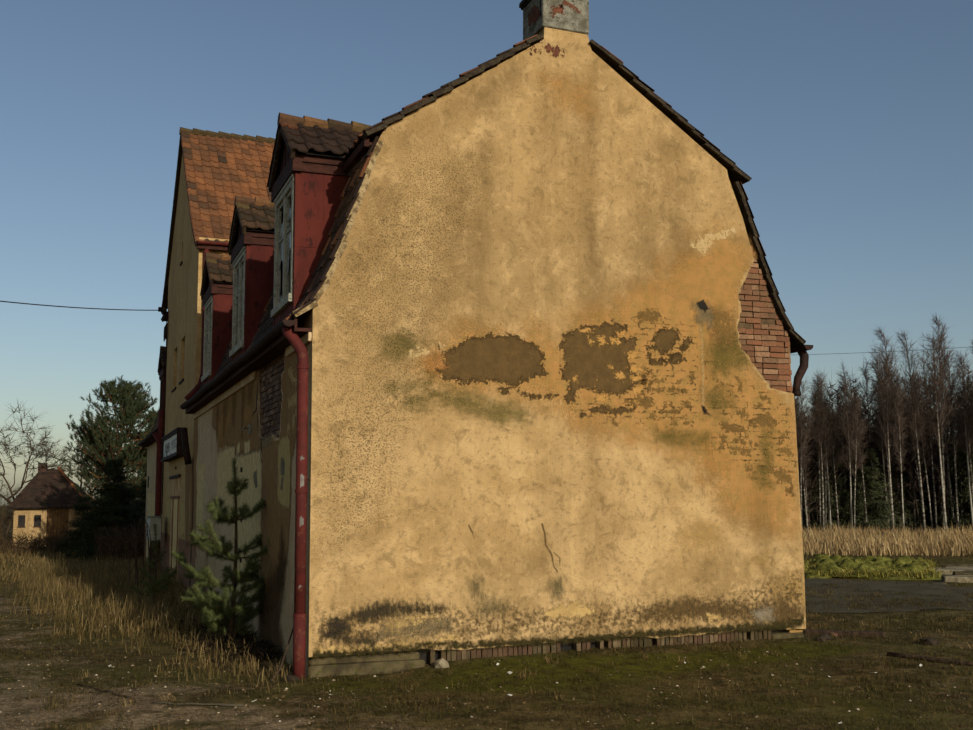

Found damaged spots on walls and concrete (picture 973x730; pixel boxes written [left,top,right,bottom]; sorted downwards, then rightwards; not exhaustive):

flaking render [528,0,580,26]
peeling [212,343,309,592]
peeling [427,238,797,529]
water stain [320,601,451,648]